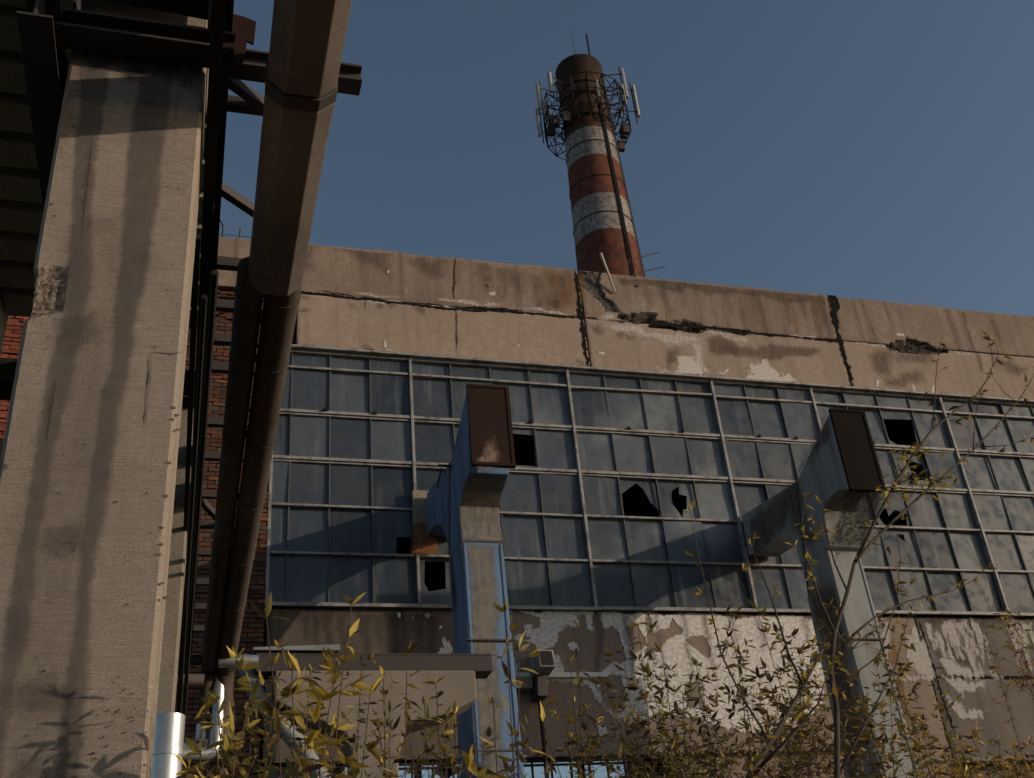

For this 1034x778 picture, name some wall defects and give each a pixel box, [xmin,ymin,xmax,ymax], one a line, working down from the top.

spalling [30,266,69,318]
crack [301,257,880,386]
spalling [578,271,750,336]
spalling [886,339,948,355]
water stain [0,50,203,778]
peeling [509,610,826,736]
peeling [880,616,1003,720]
peeling [1005,617,1034,671]